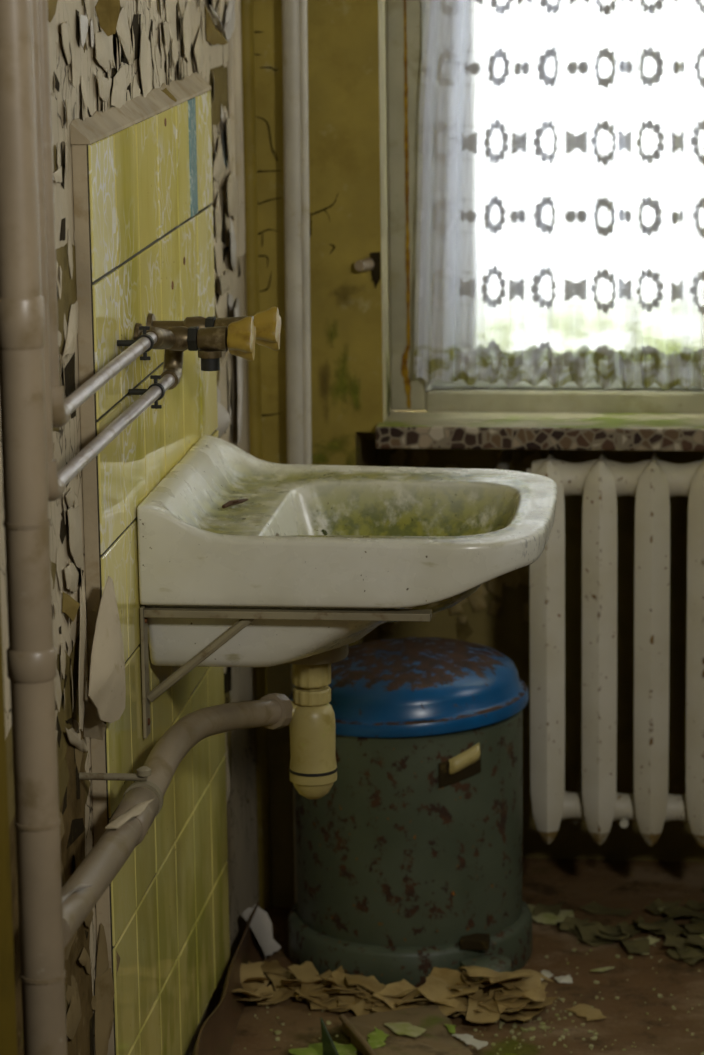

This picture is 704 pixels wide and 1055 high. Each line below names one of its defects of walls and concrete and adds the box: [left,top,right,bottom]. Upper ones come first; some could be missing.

crack [256,116,281,173]
peeling [47,0,241,397]
crack [258,229,279,292]
crack [309,194,338,254]
peeling [217,349,243,443]
peeling [51,473,126,903]
peeling [224,667,237,704]
peeling [105,798,155,829]
flaking render [6,726,24,1055]
flaking render [64,909,120,1055]